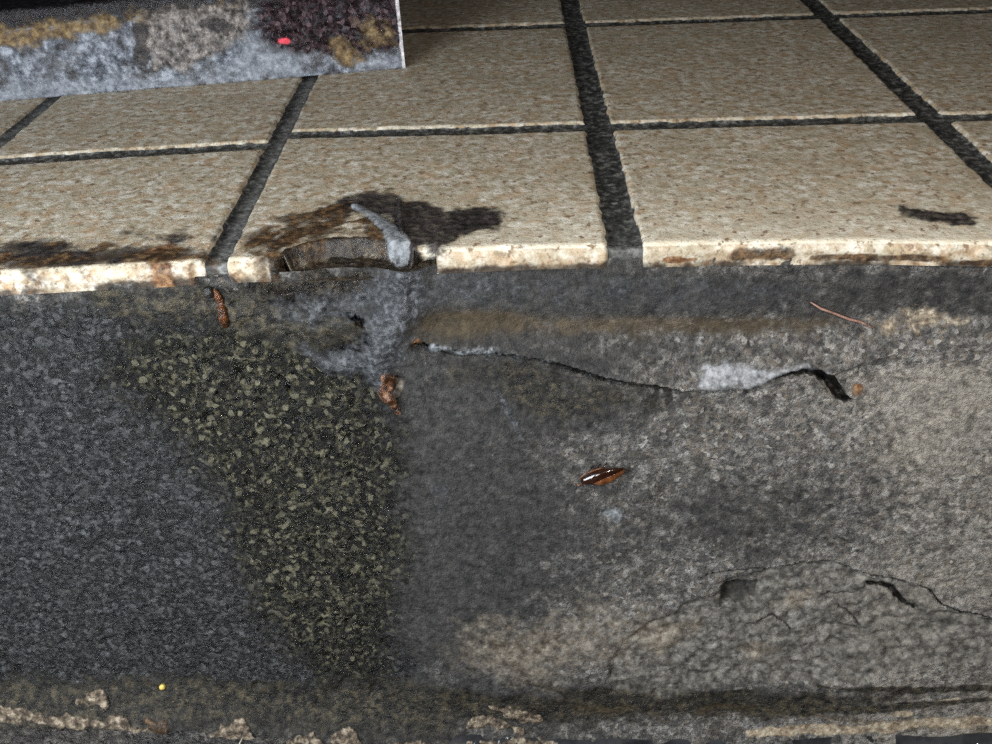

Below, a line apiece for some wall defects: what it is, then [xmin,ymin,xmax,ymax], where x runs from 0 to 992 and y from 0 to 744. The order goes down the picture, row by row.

crack [429,344,673,418]
crack [699,364,852,403]
water stain [0,281,992,740]